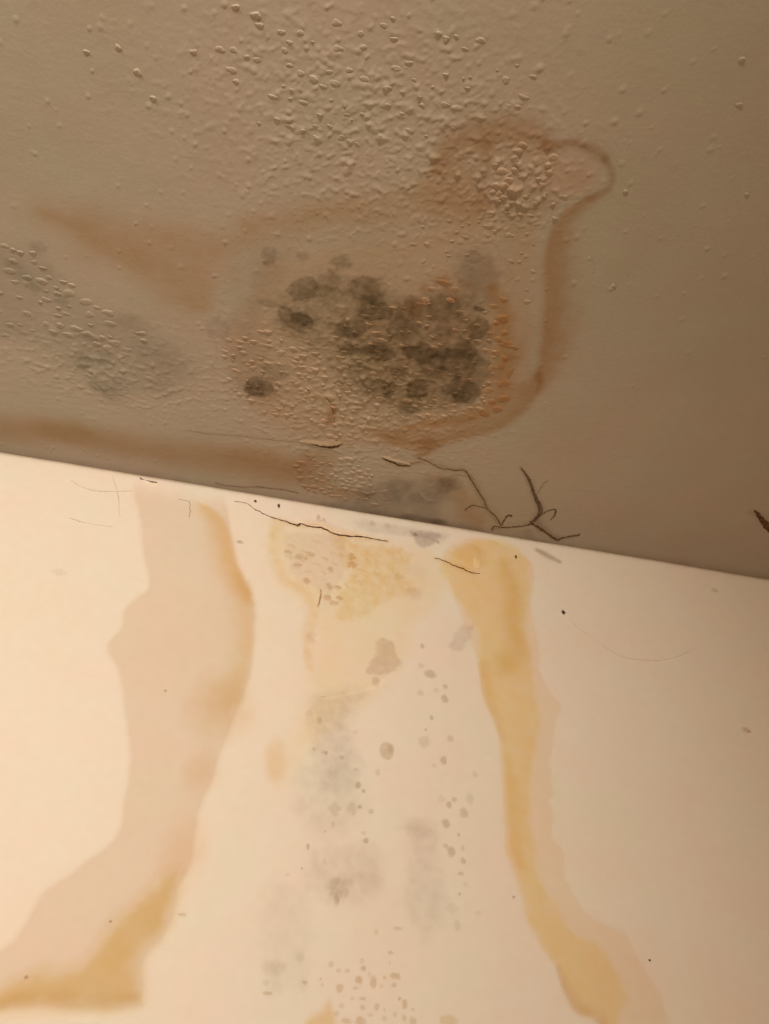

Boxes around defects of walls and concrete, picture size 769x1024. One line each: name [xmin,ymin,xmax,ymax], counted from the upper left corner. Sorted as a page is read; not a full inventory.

crack [217,483,391,545]
water stain [0,95,674,1024]